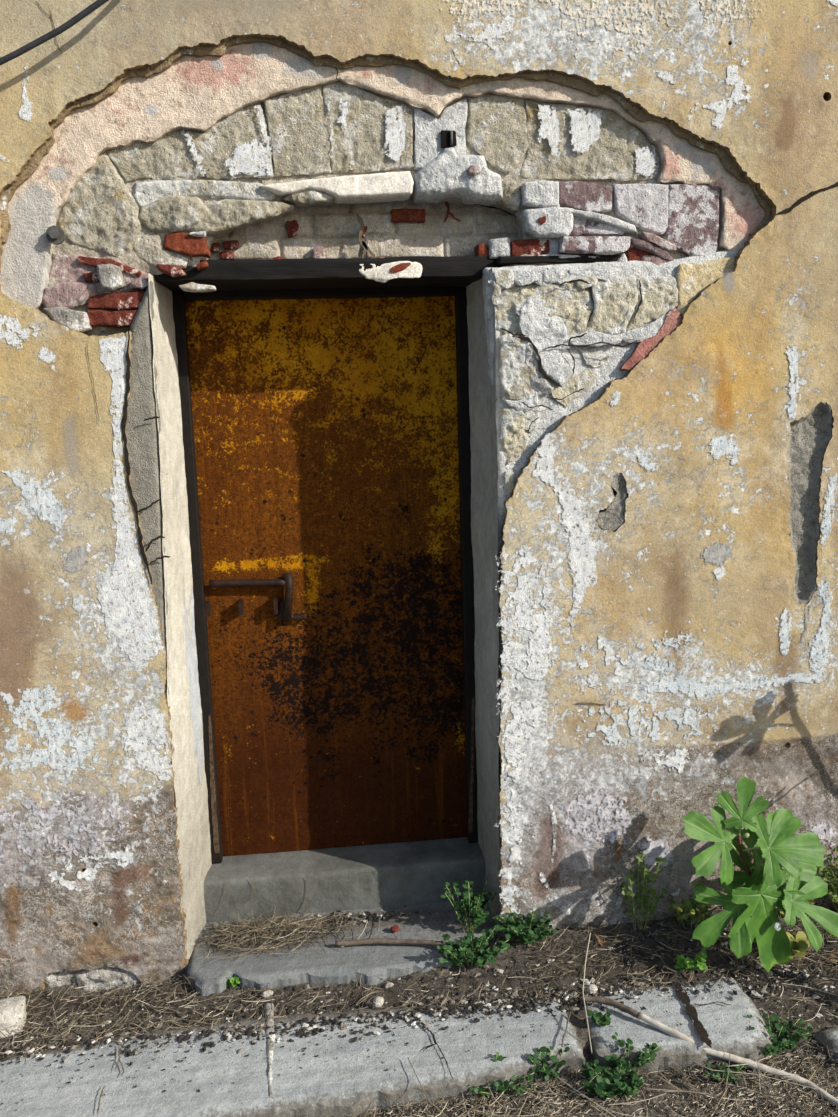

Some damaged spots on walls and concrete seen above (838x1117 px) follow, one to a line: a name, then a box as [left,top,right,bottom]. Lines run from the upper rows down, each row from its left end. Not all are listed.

crack [776,182,838,215]
flaking render [0,0,772,918]
spalling [575,345,838,747]
damp [653,746,710,773]
damp [557,787,674,869]
damp [809,819,838,847]